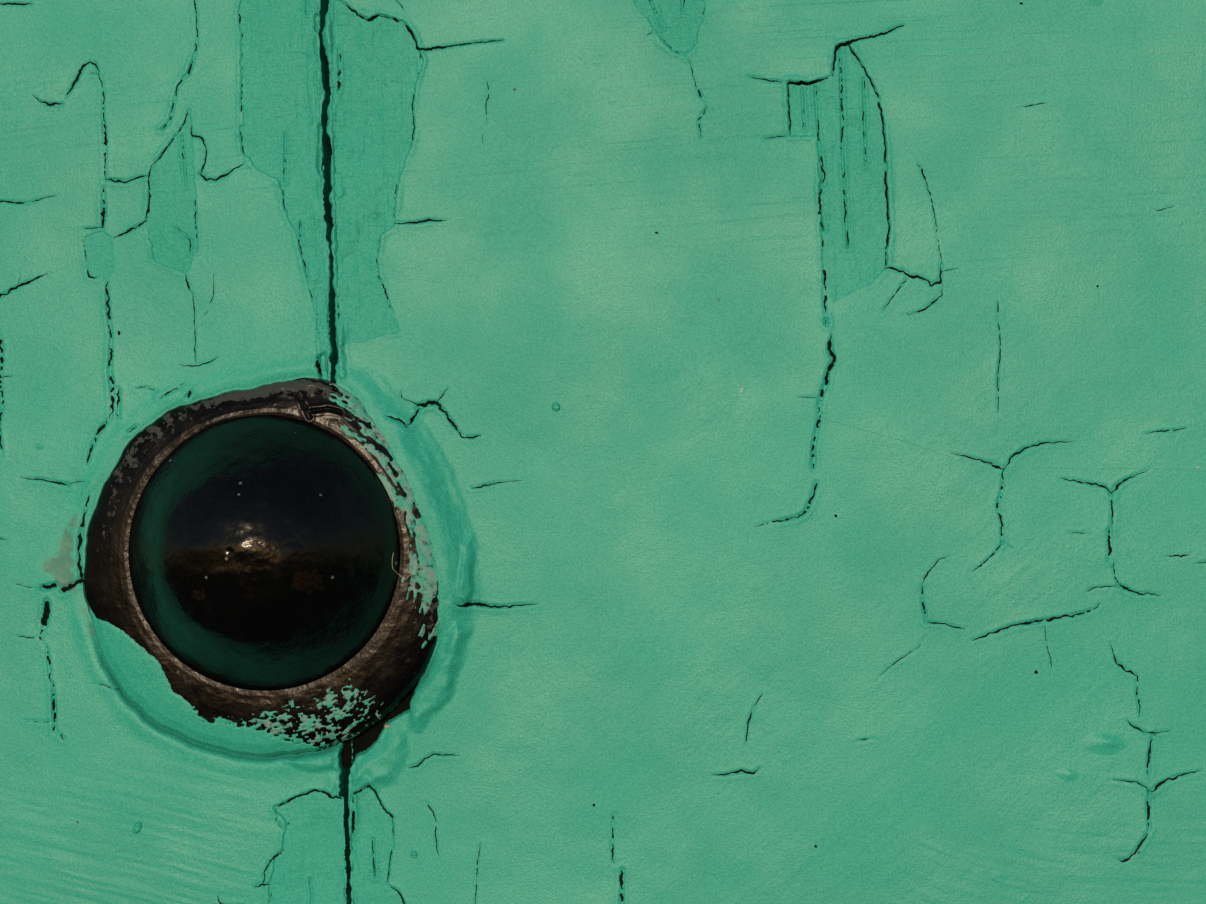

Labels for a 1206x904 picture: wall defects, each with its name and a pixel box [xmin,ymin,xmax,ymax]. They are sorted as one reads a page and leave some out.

crack [0,274,46,297]
crack [883,165,958,315]
crack [0,339,11,449]
crack [17,0,244,740]
crack [387,388,481,439]
crack [756,240,836,527]
crack [951,441,1072,571]
crack [456,601,536,609]
crack [876,470,1160,680]
peeling [342,682,418,768]
crack [715,695,762,776]
crack [1111,645,1202,862]